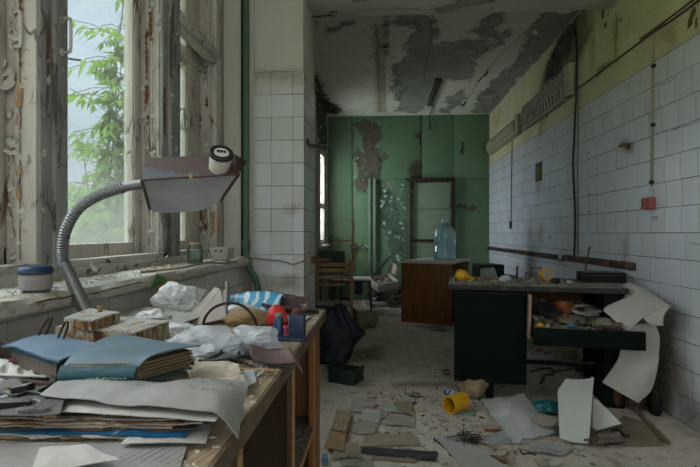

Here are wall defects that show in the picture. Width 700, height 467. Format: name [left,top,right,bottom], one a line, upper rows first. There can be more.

peeling [140,0,179,157]
water stain [314,75,342,114]
crack [461,14,545,107]
water stain [471,10,592,114]
peeling [3,76,31,264]
peeling [353,118,406,264]